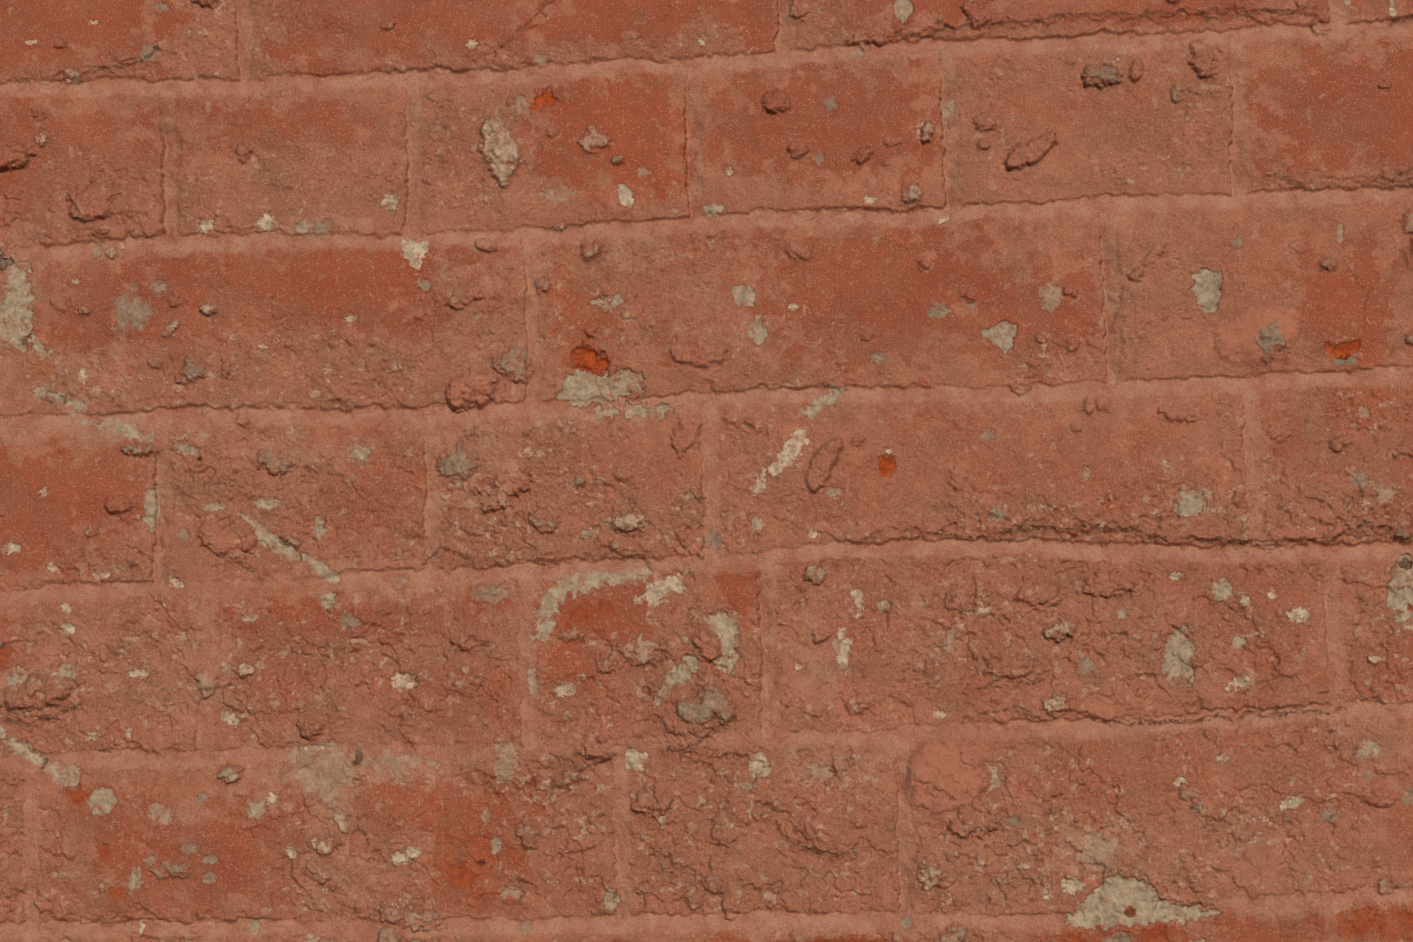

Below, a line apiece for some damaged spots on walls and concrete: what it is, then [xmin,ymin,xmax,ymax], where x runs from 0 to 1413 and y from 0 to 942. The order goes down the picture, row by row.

spalling [0,246,56,361]
spalling [555,340,684,421]
spalling [1385,553,1413,625]
spalling [1037,870,1225,942]